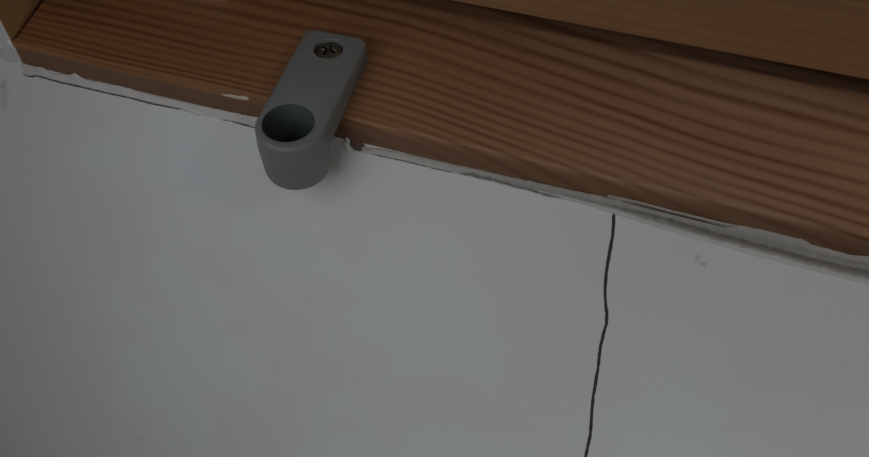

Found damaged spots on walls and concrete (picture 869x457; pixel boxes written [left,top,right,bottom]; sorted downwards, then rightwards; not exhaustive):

crack [584,214,615,457]